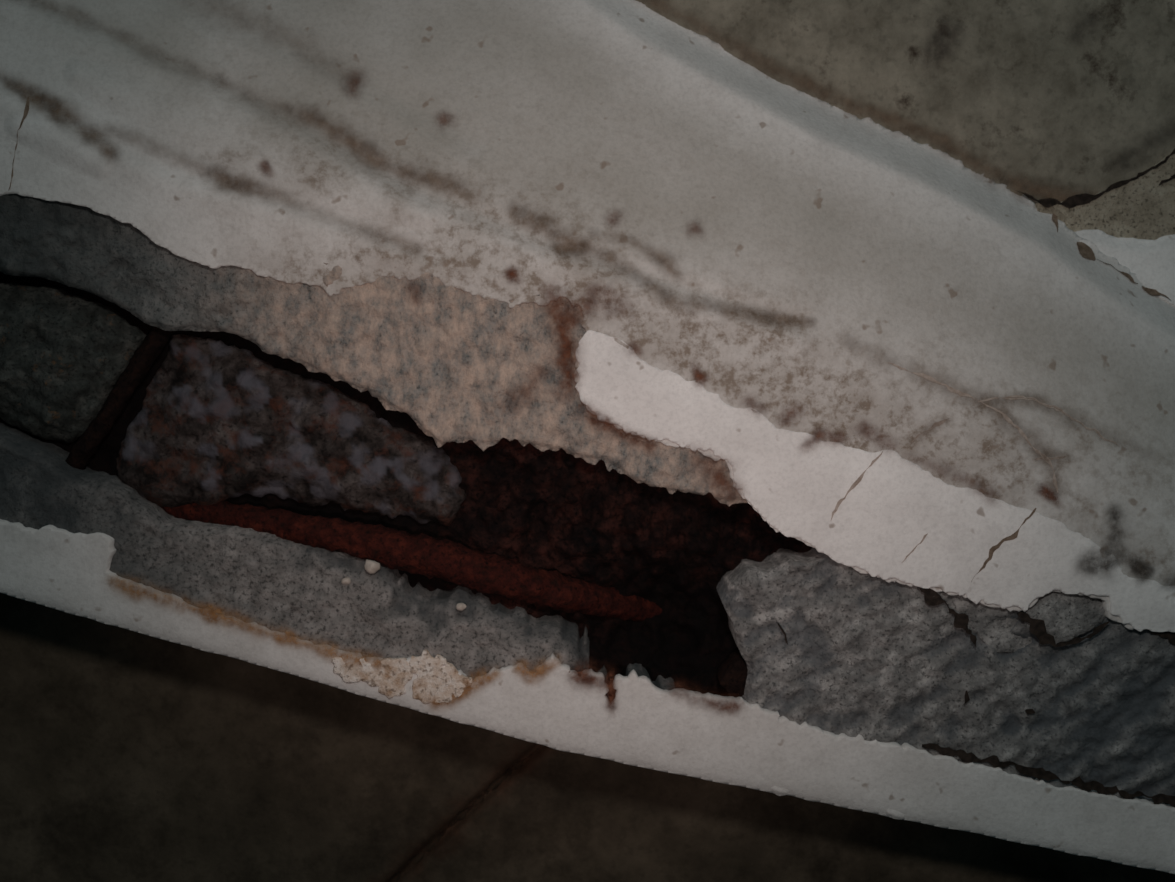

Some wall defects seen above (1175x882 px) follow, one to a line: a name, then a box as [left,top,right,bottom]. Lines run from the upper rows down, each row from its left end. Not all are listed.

spalling [0,194,1175,807]